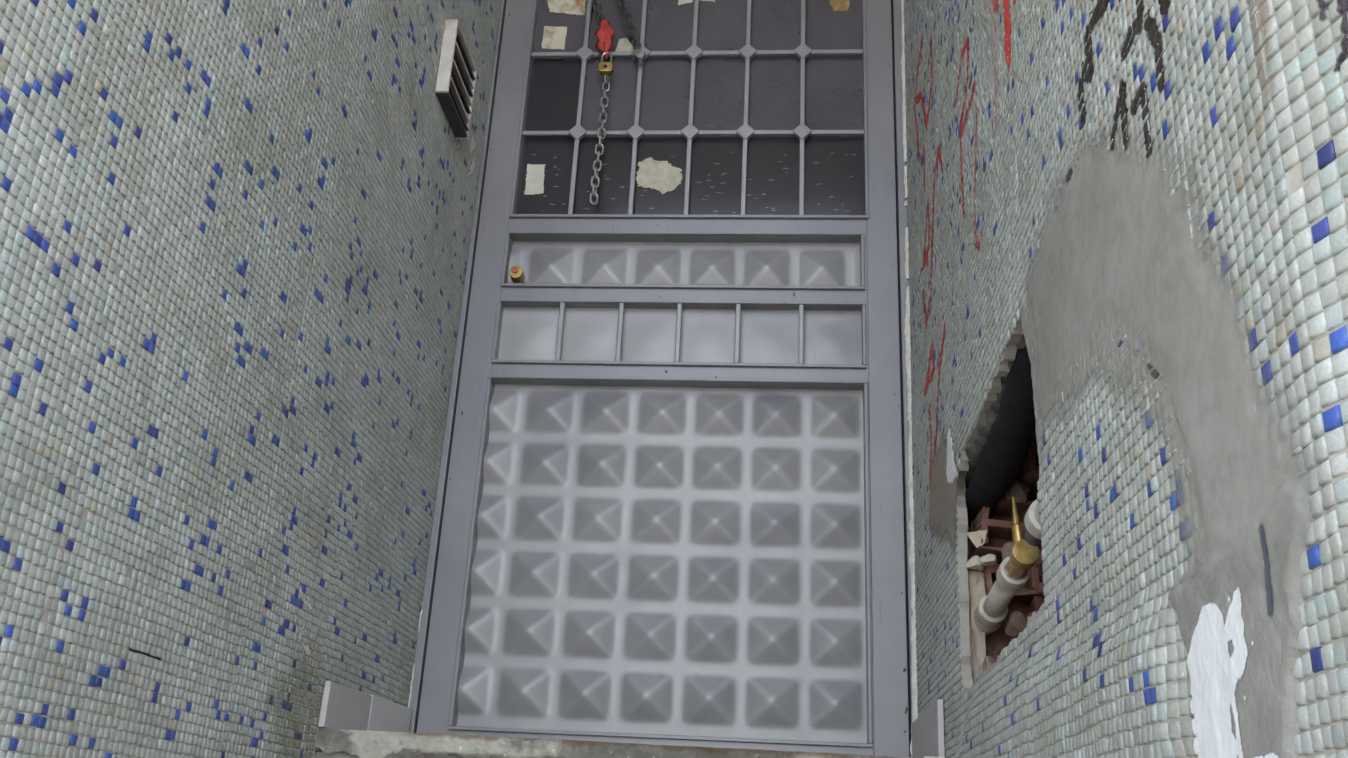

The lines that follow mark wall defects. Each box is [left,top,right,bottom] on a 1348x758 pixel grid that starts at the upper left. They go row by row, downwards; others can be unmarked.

spalling [963,428,1045,684]
flaking render [314,728,946,758]